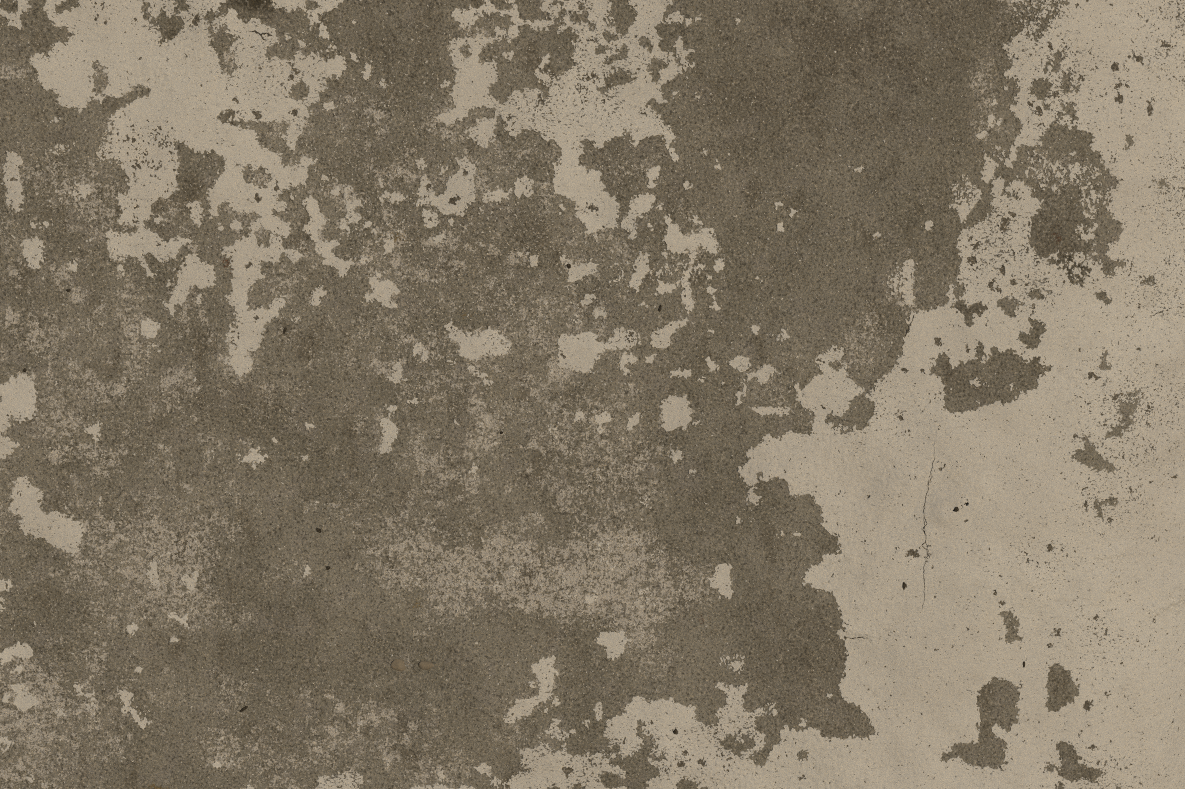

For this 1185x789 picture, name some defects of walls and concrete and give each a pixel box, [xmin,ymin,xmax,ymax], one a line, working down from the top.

peeling [1137,0,1185,64]
peeling [876,539,933,592]
peeling [939,548,1143,789]